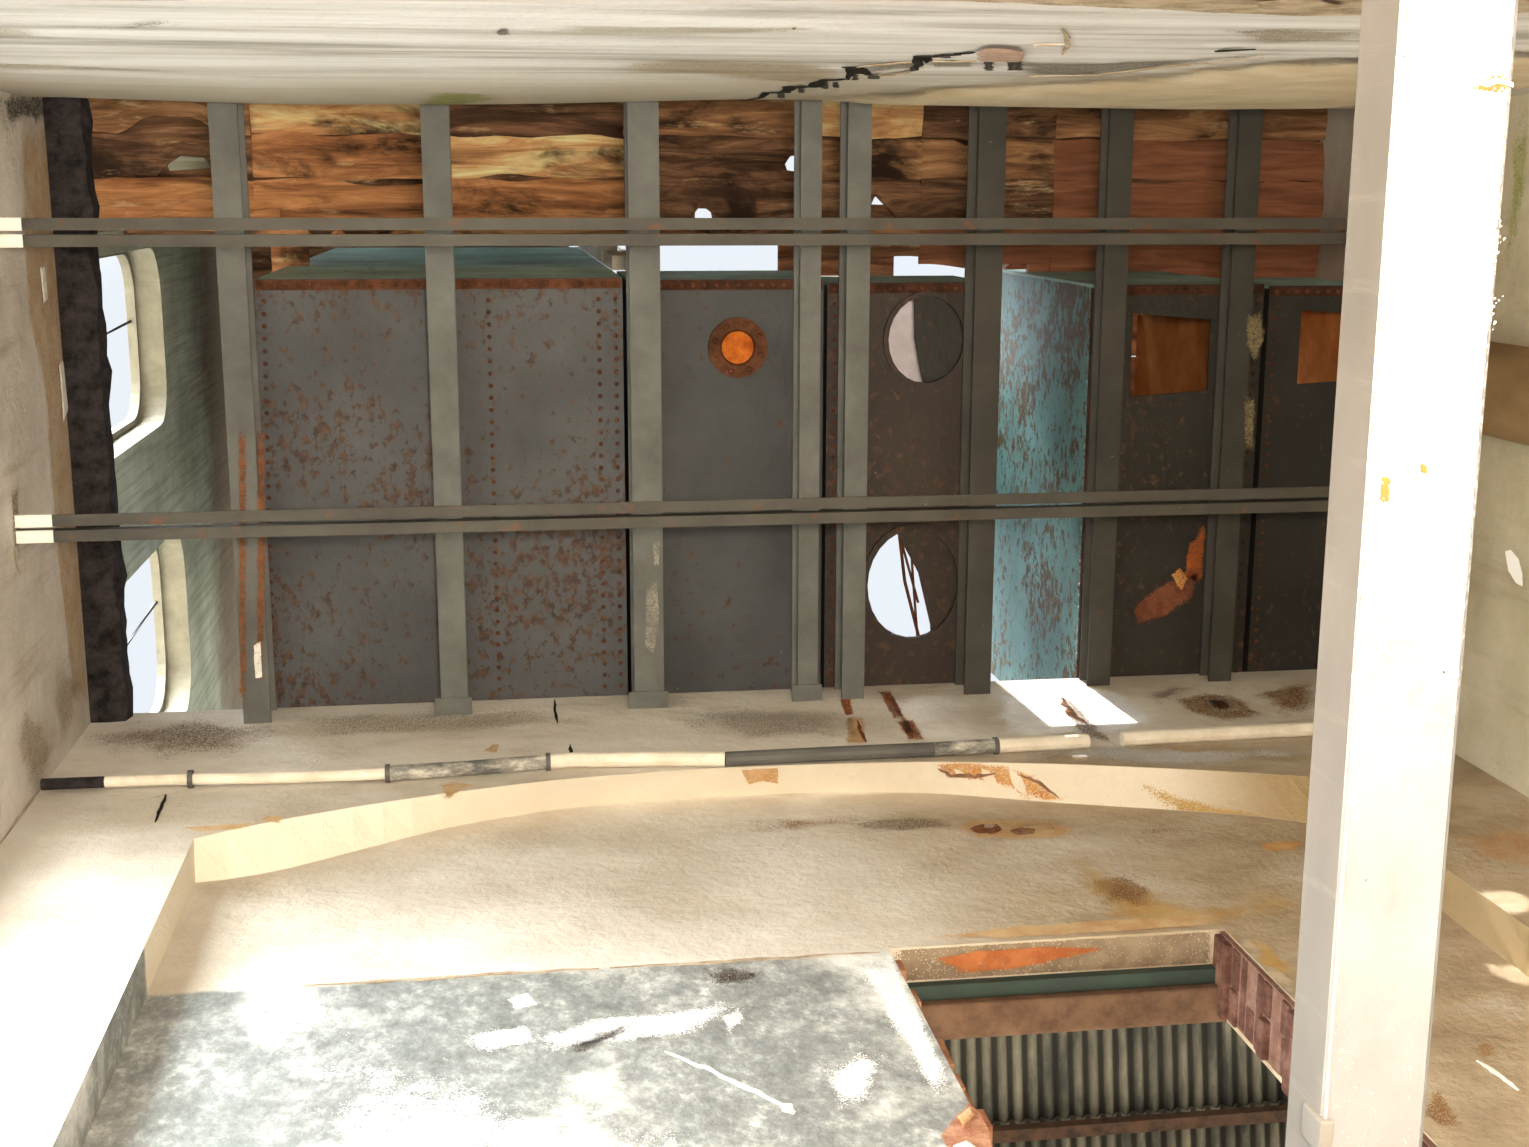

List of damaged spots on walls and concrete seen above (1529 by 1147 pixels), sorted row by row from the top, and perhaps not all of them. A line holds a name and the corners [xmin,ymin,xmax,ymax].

crack [740,52,976,101]
crack [910,0,1362,77]
crack [1518,0,1529,13]
rust [236,421,267,698]
rust [1132,518,1206,626]